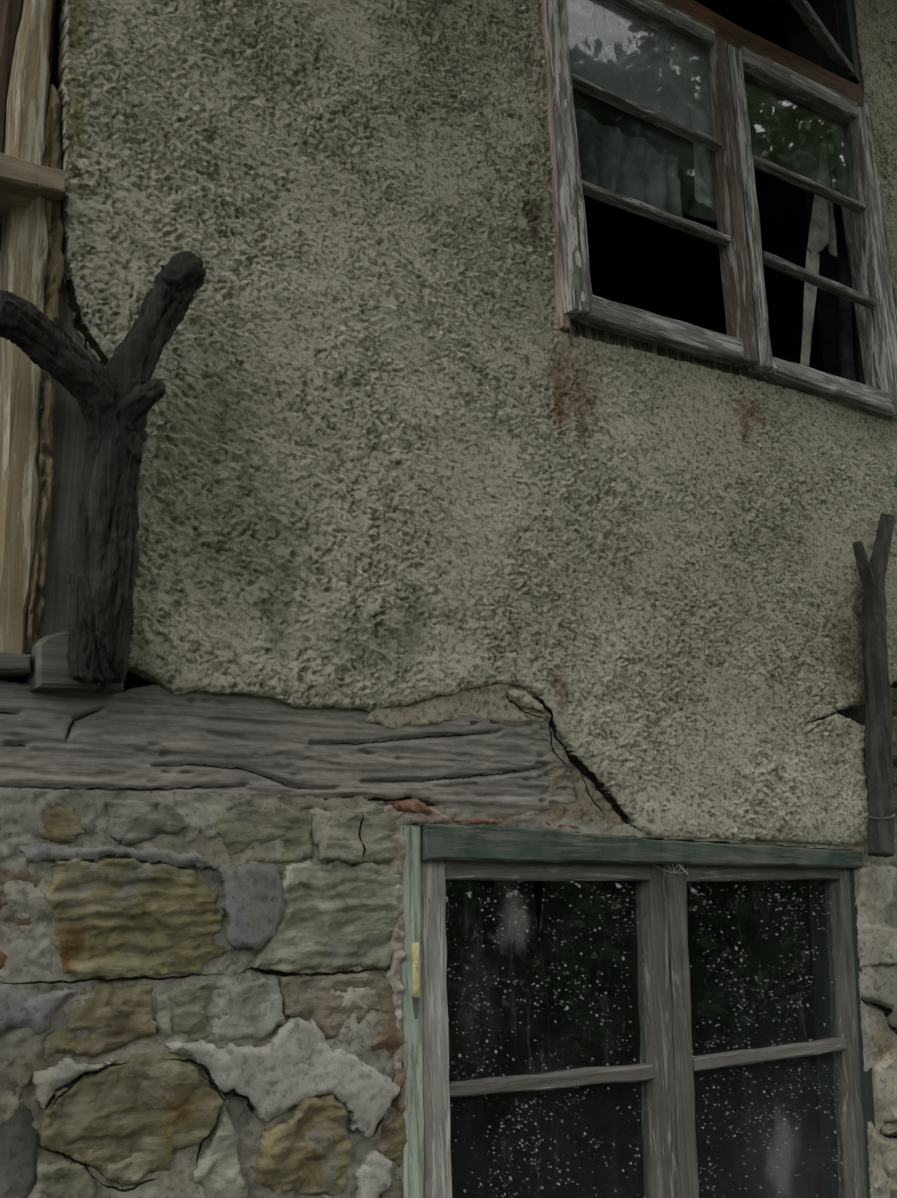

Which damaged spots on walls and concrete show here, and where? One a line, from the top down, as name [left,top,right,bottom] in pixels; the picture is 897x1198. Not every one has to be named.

crack [325,733,492,745]
crack [366,688,645,834]